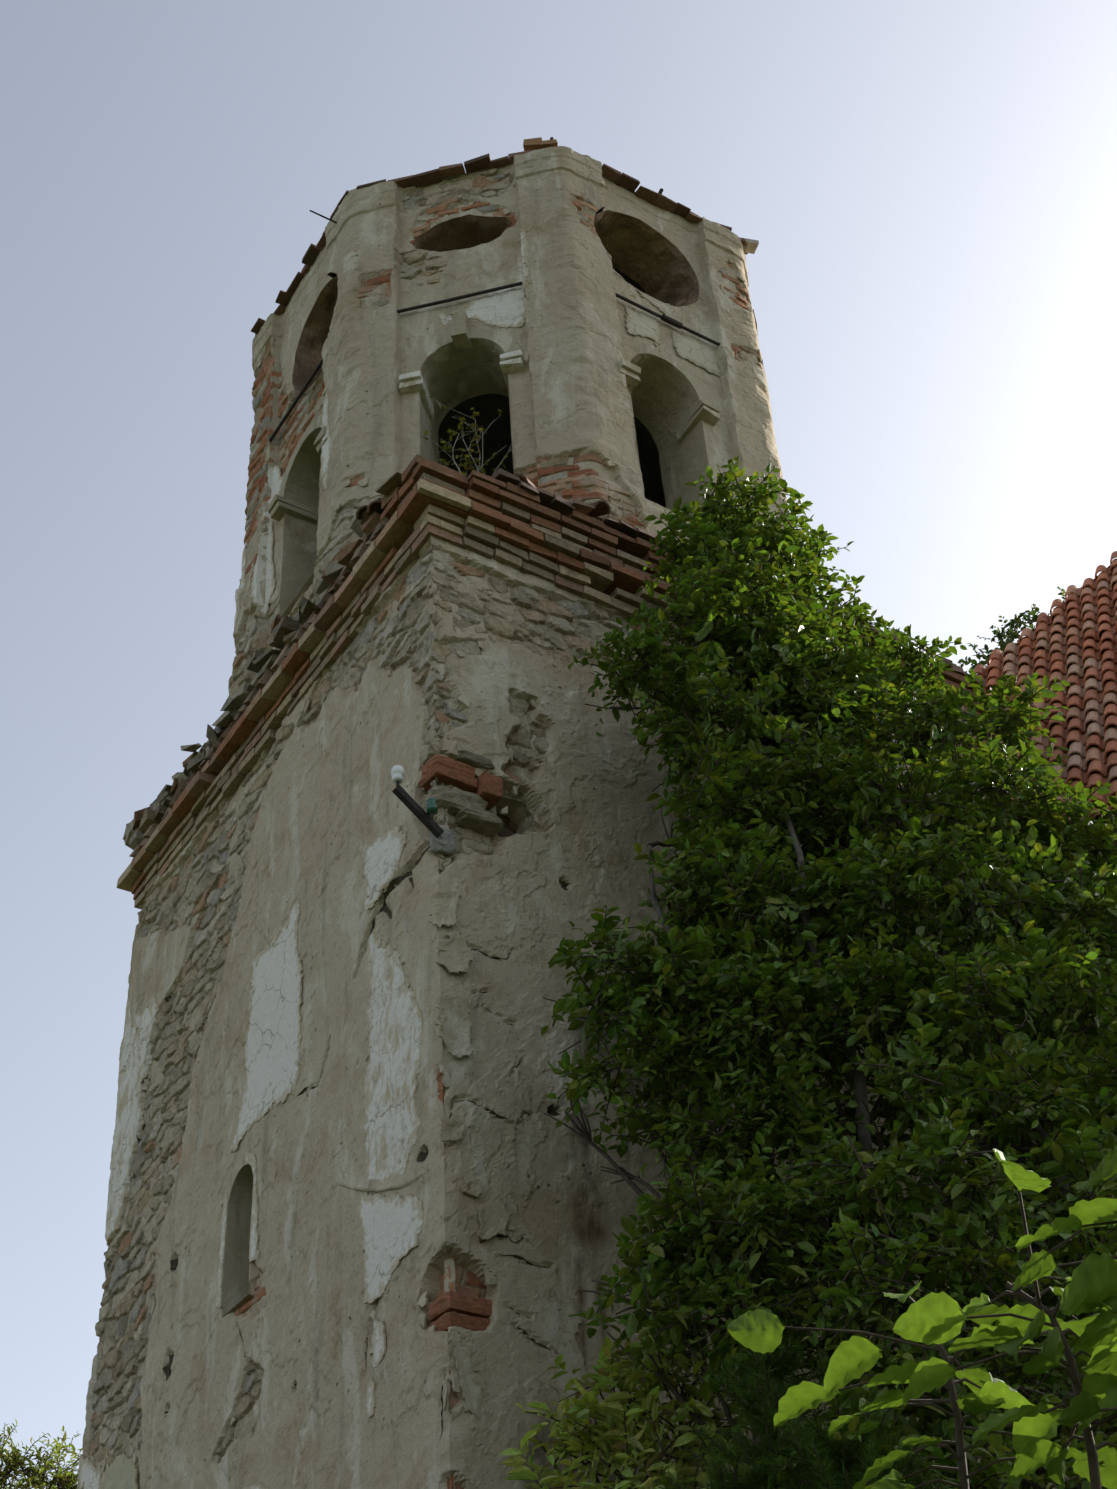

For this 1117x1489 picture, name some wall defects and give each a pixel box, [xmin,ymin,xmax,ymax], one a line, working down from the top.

peeling [348,168,531,328]
spalling [228,338,383,698]
spalling [515,452,644,528]
spalling [79,544,705,1489]
crack [496,1235,546,1267]
crack [510,1307,552,1351]